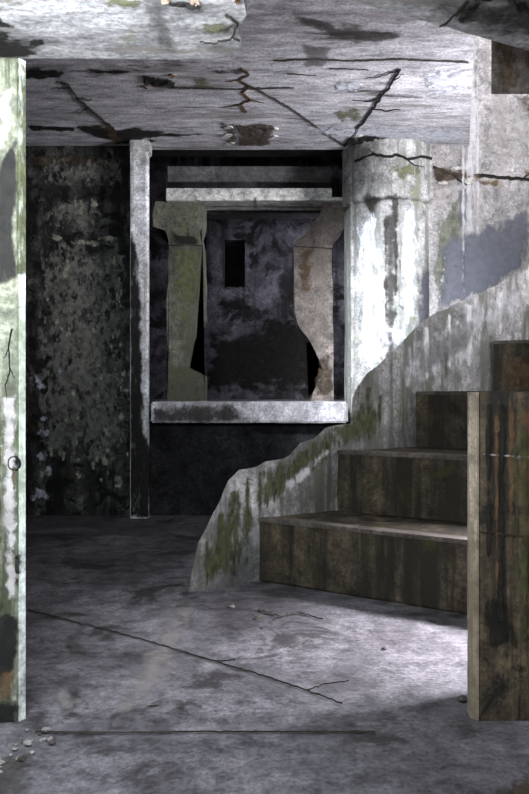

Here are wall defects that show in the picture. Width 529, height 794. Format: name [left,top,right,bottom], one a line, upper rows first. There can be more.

crack [200,0,240,45]
crack [439,0,475,28]
damp [34,154,126,187]
spalling [222,123,279,146]
crack [167,58,529,186]
damp [364,194,399,357]
spalling [434,166,473,225]
damp [397,41,529,386]
peeling [438,213,529,307]
damp [37,232,149,517]
damp [154,406,239,423]
damp [245,437,339,544]